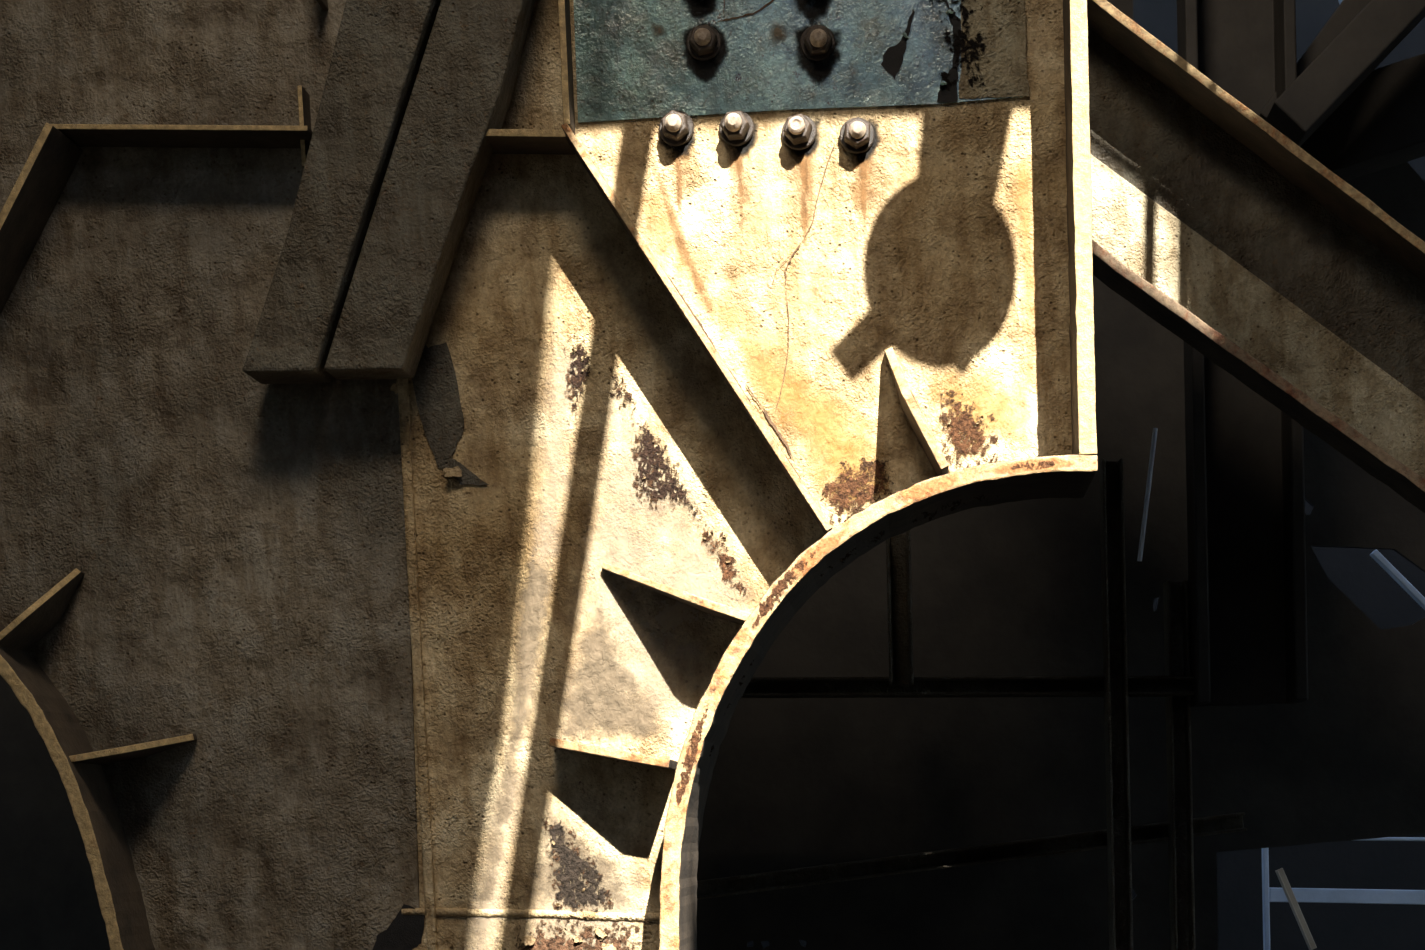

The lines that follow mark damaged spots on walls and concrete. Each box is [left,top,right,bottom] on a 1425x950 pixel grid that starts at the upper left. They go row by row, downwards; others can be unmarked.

crack [660,144,835,479]
rust [948,379,1016,439]
peeling [515,813,642,950]